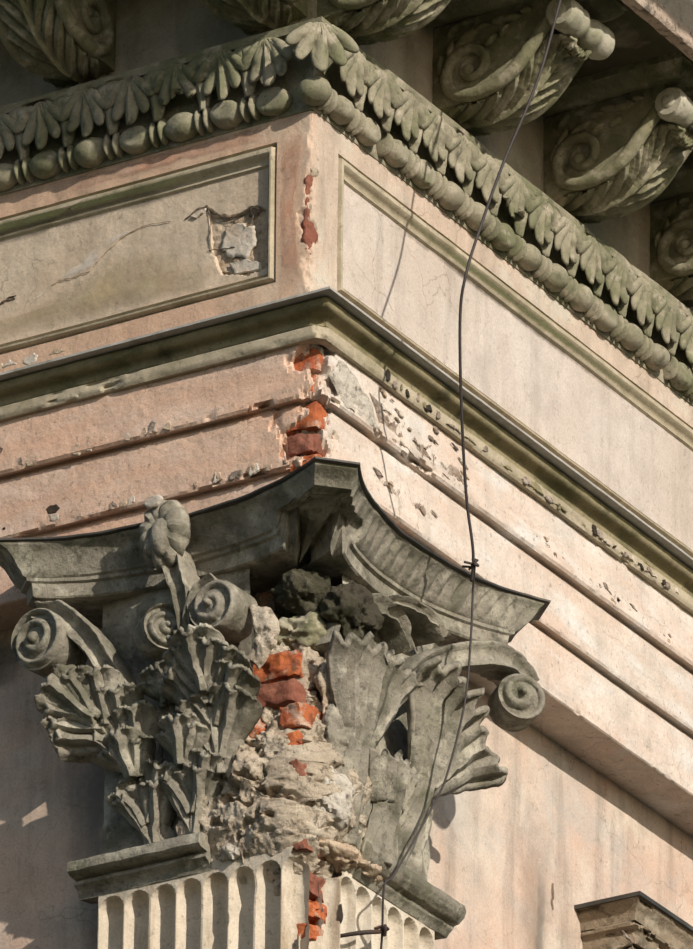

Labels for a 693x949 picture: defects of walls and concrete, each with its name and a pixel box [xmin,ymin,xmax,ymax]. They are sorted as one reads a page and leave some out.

peeling [112,141,223,176]
flaking render [185,205,269,276]
peeling [282,147,319,263]
spalling [213,348,488,494]
spalling [198,568,384,941]
spalling [176,813,187,836]